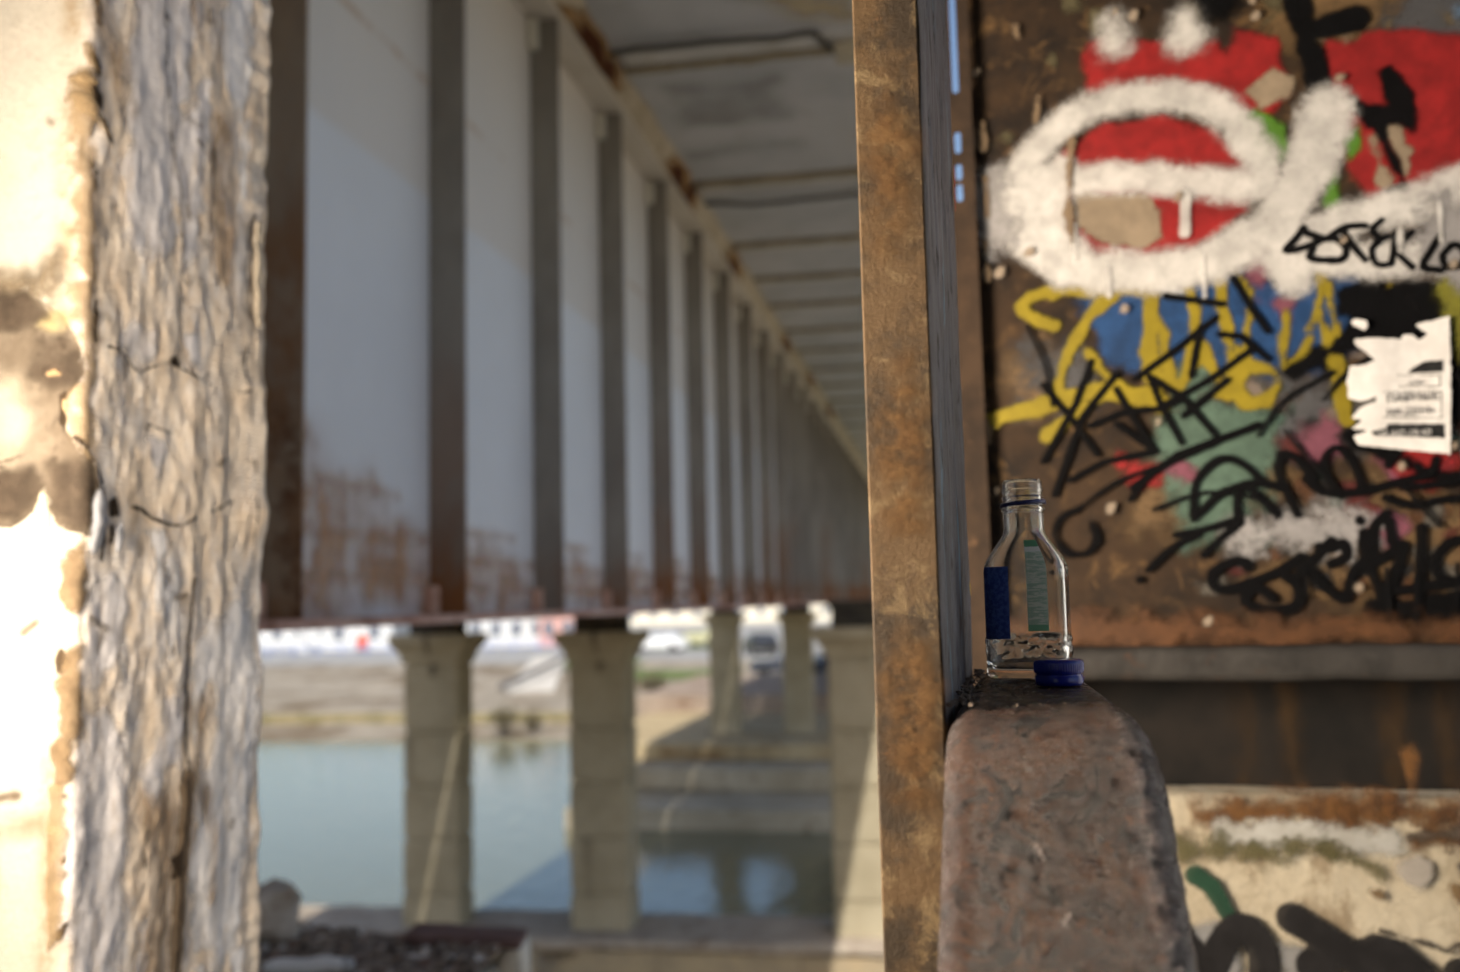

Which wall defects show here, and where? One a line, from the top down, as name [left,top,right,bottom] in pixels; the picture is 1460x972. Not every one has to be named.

rust [553,0,622,93]
rust [664,155,697,213]
damp [0,252,61,300]
spalling [0,0,264,972]
crack [72,435,260,969]